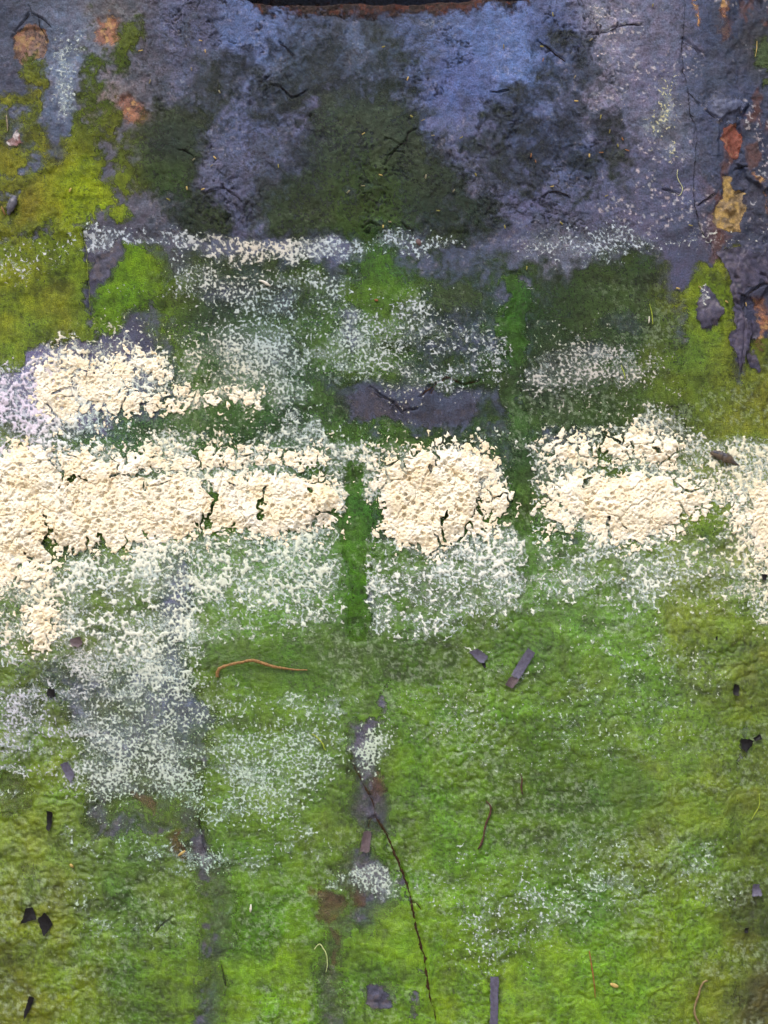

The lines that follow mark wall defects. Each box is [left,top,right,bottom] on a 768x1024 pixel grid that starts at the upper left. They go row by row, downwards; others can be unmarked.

corrosion [250,0,530,20]
damp [49,30,84,119]
damp [645,75,677,164]
crack [665,0,748,250]
peeling [701,91,747,160]
spalling [712,176,747,232]
peeling [716,246,768,373]
damp [0,220,768,765]
damp [0,510,398,877]
damp [326,864,399,898]
damp [451,831,741,973]